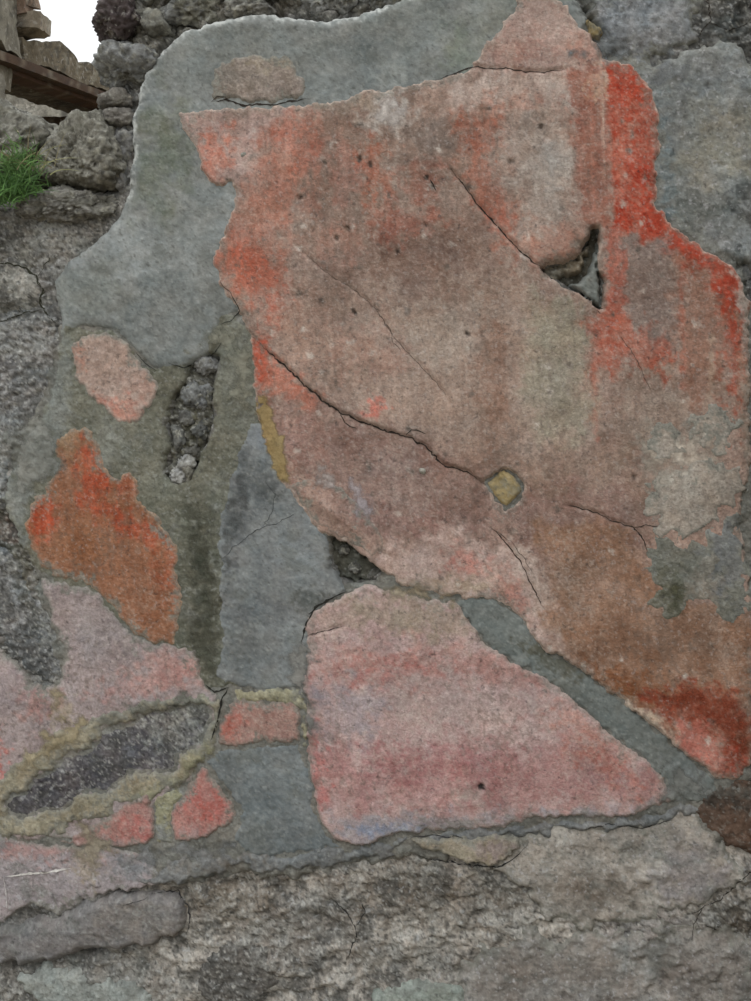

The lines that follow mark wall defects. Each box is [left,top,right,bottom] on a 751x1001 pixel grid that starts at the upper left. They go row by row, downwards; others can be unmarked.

crack [441,66,555,79]
crack [430,172,552,279]
crack [1,258,60,323]
crack [137,283,240,370]
spalling [543,229,602,310]
spalling [163,355,219,484]
crack [253,337,486,485]
spalling [332,537,380,583]
crack [491,528,541,604]
crack [568,505,656,552]
flaking render [411,804,751,1001]